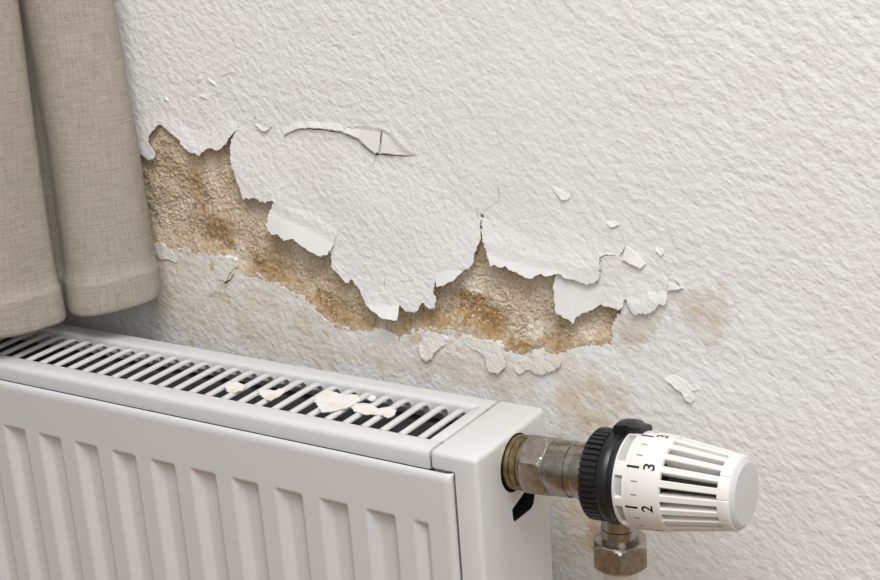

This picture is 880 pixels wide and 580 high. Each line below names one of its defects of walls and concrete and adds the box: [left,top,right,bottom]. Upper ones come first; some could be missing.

crack [293,128,409,165]
peeling [135,112,683,375]
damp [139,245,642,443]
peeling [665,376,701,403]
damp [548,496,604,580]
damp [639,529,665,575]